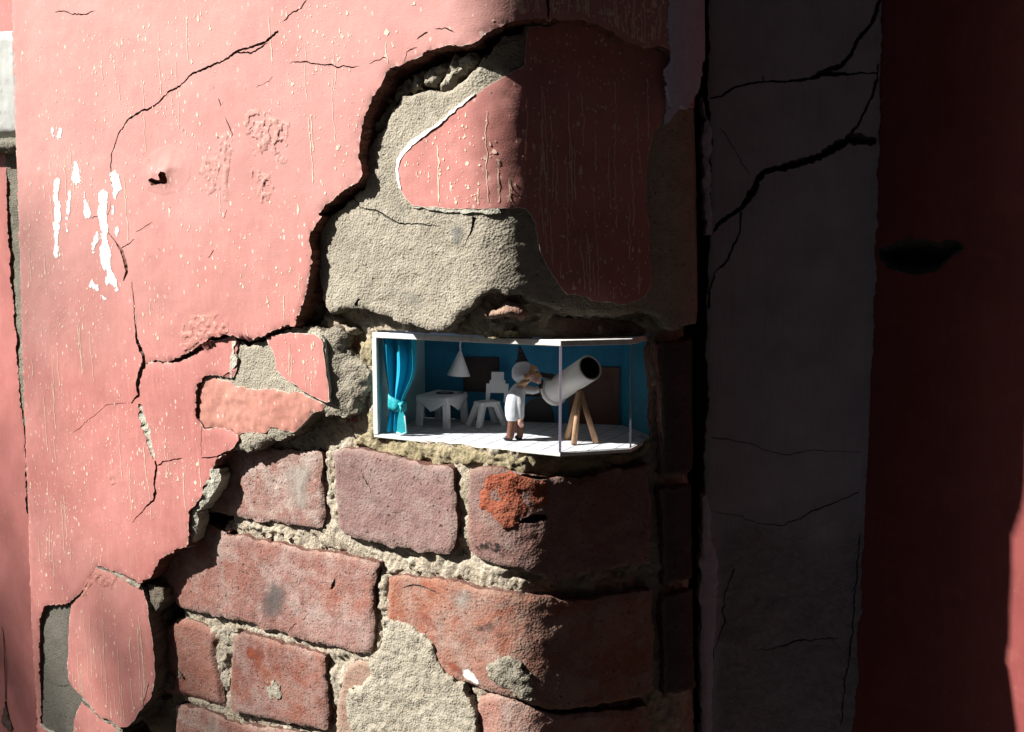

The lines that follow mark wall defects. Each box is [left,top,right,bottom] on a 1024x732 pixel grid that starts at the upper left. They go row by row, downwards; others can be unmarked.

crack [76,1,306,522]
flaking render [176,22,699,452]
crack [707,0,882,309]
flaking render [184,466,231,548]
spalling [479,471,549,531]